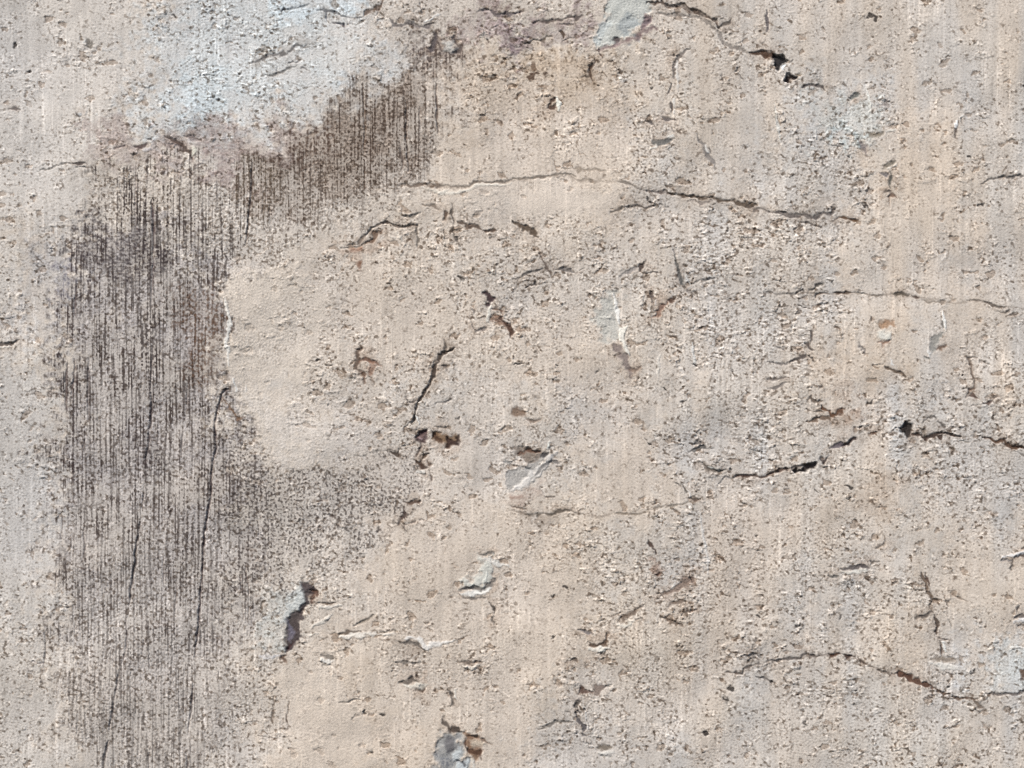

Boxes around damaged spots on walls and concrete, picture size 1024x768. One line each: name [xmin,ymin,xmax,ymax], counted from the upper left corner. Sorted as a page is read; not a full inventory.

spalling [592,0,671,59]
crack [644,0,835,120]
crack [340,165,862,300]
water stain [0,0,603,768]
crack [386,330,461,462]
crack [506,274,1024,529]
peeling [249,573,402,768]
spalling [390,667,493,768]
crack [720,568,1024,712]